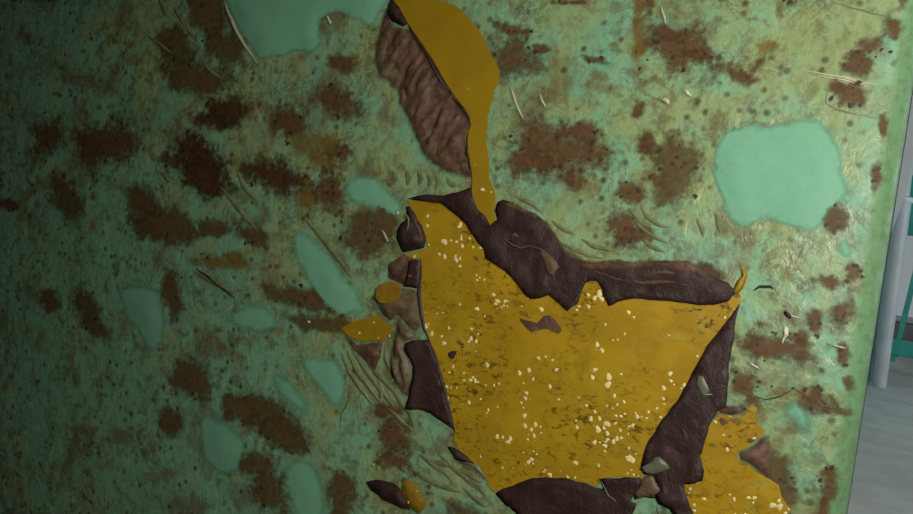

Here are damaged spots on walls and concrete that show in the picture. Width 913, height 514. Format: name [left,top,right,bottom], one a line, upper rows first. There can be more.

corrosion [642,0,764,84]
corrosion [829,19,901,108]
corrosion [508,115,612,191]
corrosion [638,132,662,155]
corrosion [879,114,889,136]
corrosion [871,167,882,189]
peeling [341,0,791,514]
corrosion [743,310,822,362]
peeling [782,310,801,344]
corrosion [834,303,854,325]
corrosion [837,344,854,389]
corrosion [801,384,851,415]